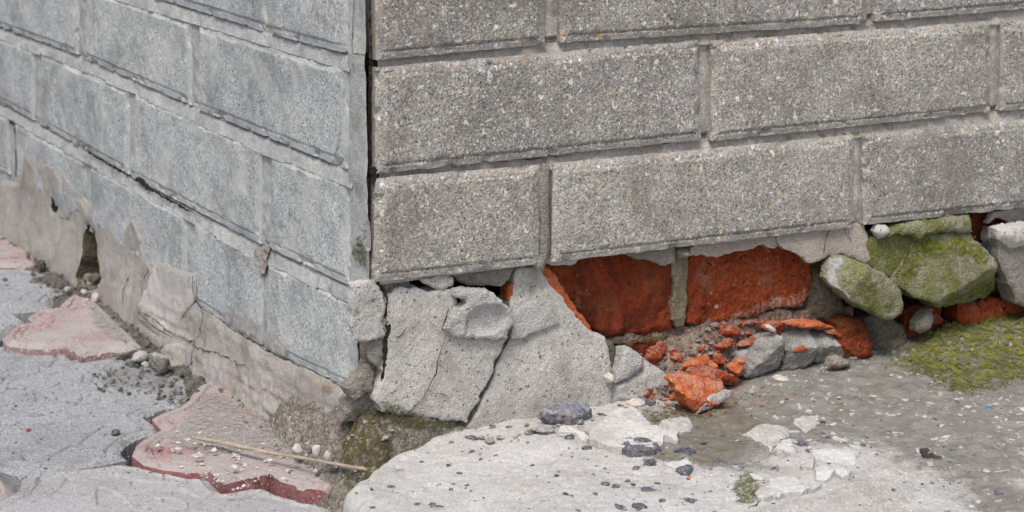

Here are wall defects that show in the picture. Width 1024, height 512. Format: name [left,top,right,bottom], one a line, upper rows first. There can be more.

crack [352,0,378,259]
flaking render [625,223,870,266]
flaking render [138,263,195,331]
crack [381,293,406,381]
crack [402,308,510,423]